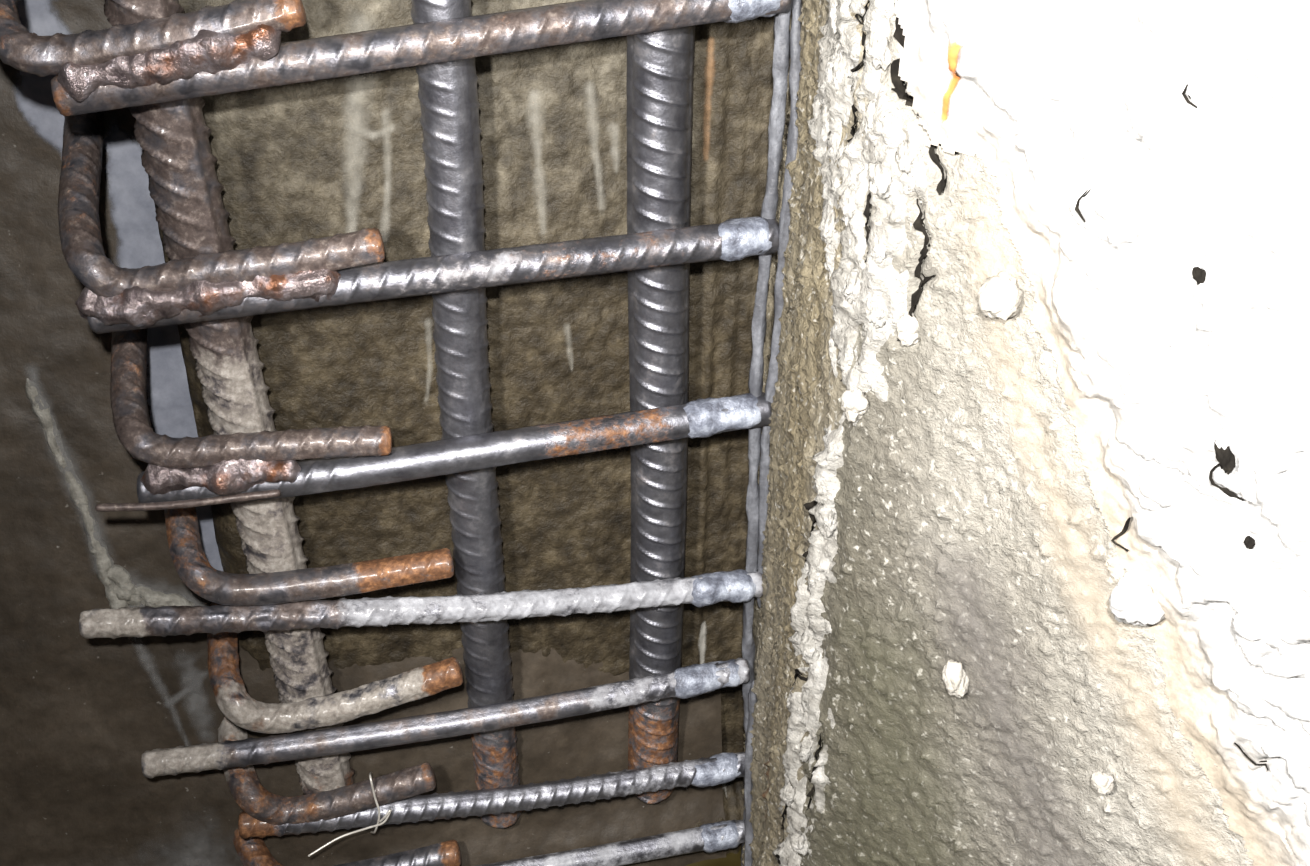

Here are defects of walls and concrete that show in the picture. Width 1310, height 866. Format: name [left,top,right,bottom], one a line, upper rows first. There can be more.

spalling [128,97,236,260]
spalling [415,57,486,257]
spalling [626,25,695,234]
crack [846,0,957,341]
crack [1075,189,1091,223]
spalling [184,316,277,435]
spalling [628,263,690,411]
crack [1111,517,1131,552]
crack [1209,464,1244,501]
spalling [79,437,763,795]
crack [775,731,824,865]
crack [1234,743,1268,771]